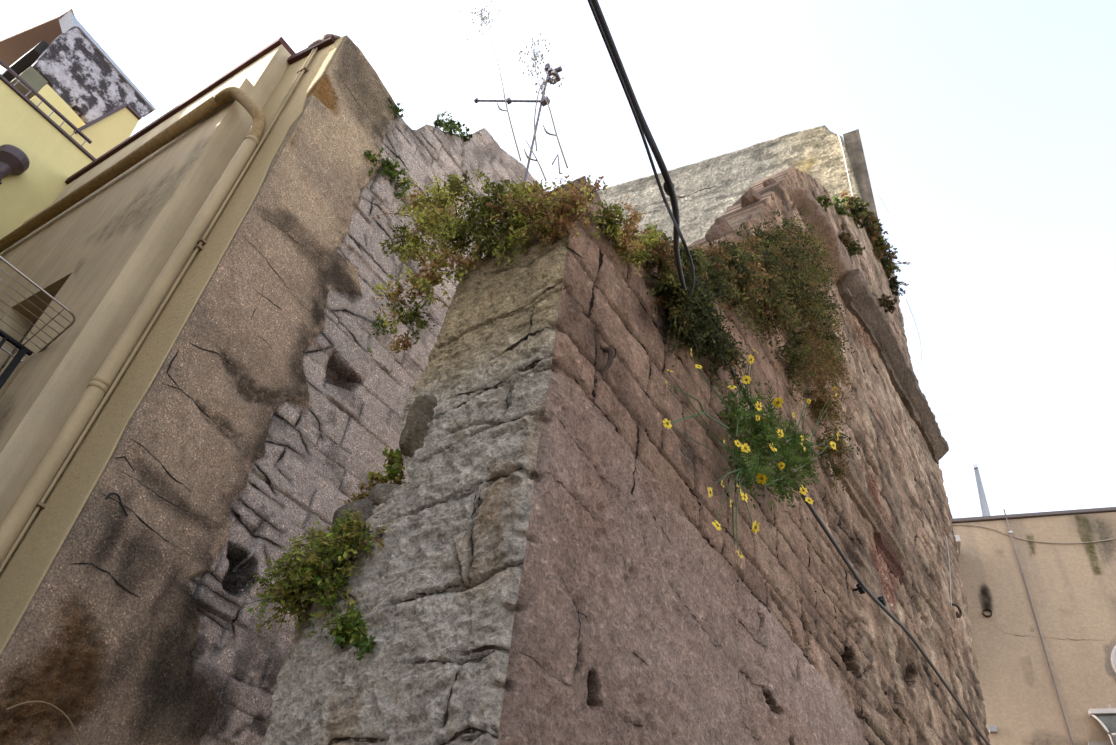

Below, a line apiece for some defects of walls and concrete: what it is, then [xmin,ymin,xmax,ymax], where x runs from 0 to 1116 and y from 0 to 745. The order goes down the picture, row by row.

crack [164,342,243,451]
crack [100,436,215,554]
crack [73,563,139,597]